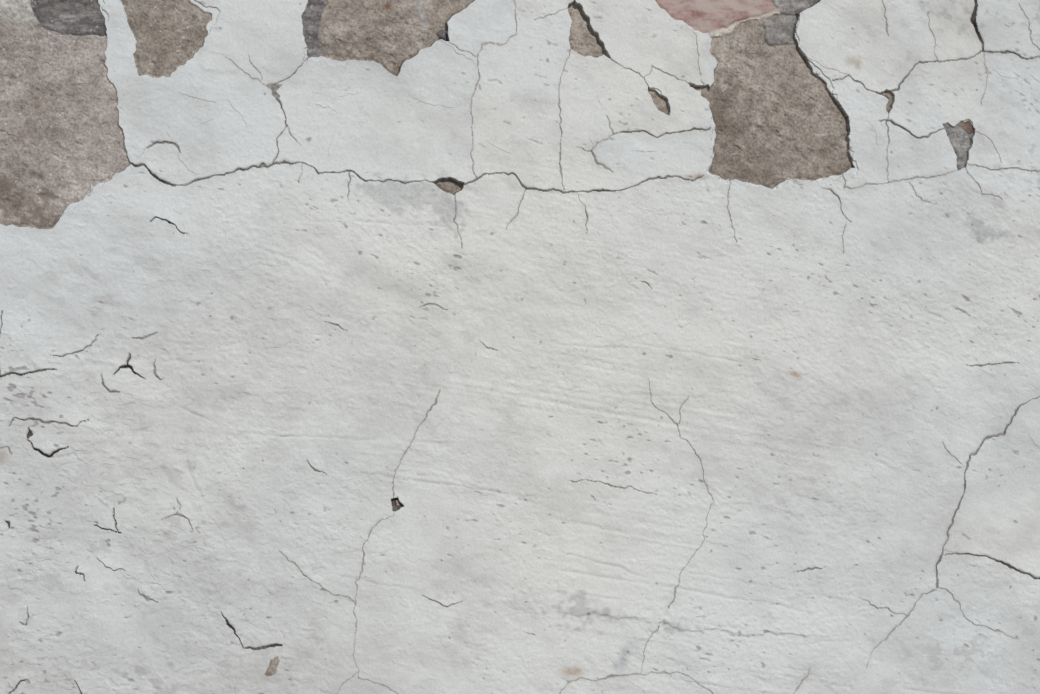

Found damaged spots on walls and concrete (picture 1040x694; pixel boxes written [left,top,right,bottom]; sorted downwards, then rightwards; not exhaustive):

spalling [0,0,131,229]
peeling [148,212,188,234]
crack [131,55,434,198]
crack [448,0,711,249]
peeling [121,0,1040,195]
crack [727,180,737,243]
crack [823,0,1040,254]
crack [0,368,57,378]
crack [278,390,441,694]
crack [859,396,1040,669]